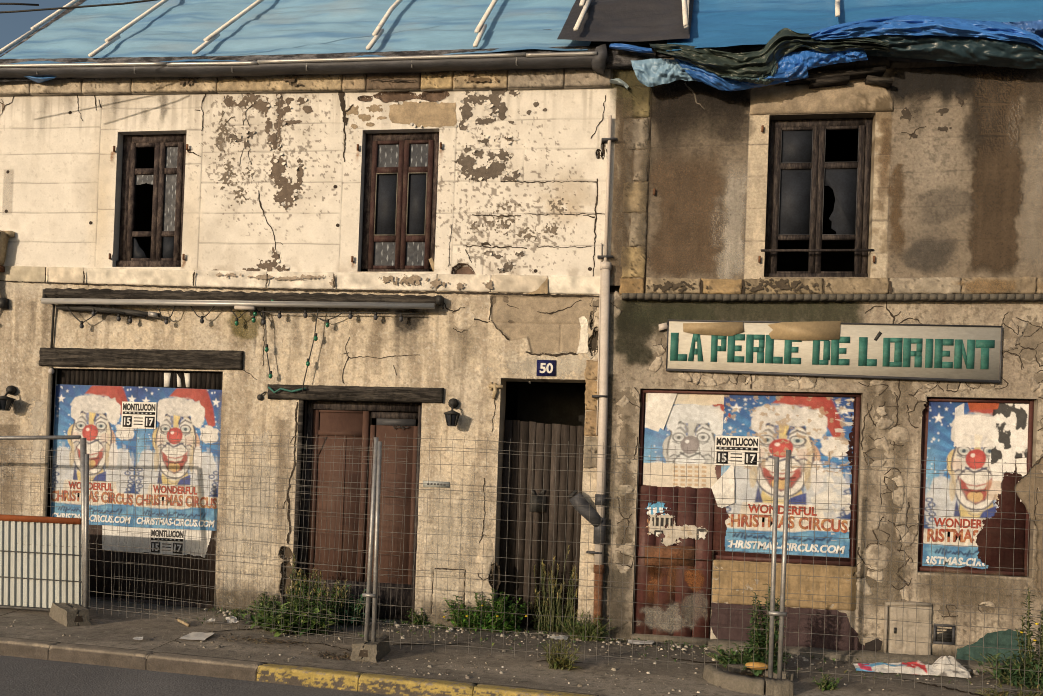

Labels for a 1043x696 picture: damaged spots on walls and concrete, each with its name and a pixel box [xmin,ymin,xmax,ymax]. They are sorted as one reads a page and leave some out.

crack [187,94,253,166]
peeling [214,75,313,210]
crack [338,92,354,162]
peeling [345,71,520,183]
leakage [612,69,750,278]
leakage [879,65,1043,293]
crack [0,178,602,383]
crack [283,402,298,544]
peeling [614,387,642,574]
crack [860,380,901,450]
peeling [1001,312,1043,393]
flaking render [1014,450,1043,597]